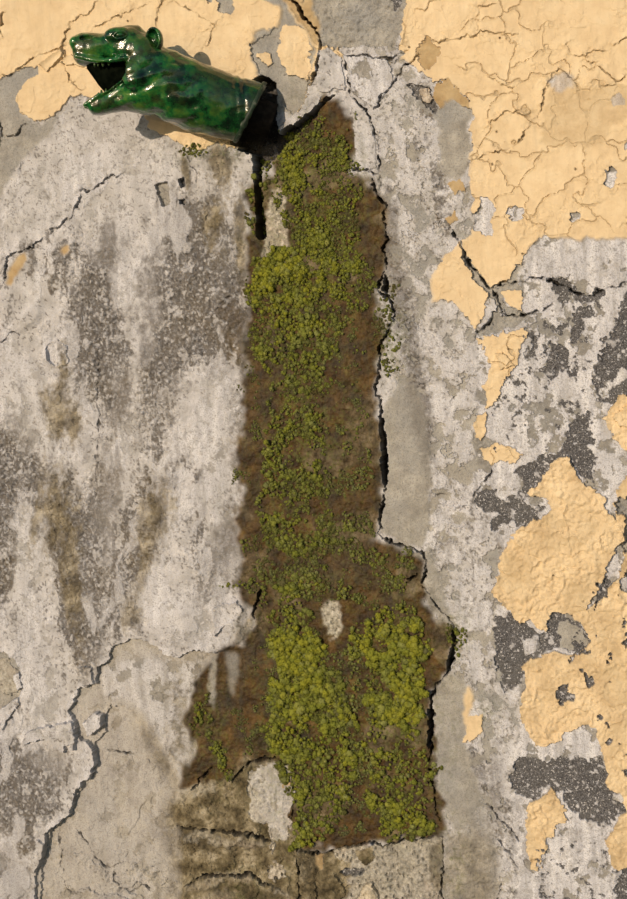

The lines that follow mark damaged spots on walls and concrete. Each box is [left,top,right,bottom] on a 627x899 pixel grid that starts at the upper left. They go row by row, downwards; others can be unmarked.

peeling [0,49,87,197]
crack [0,172,123,289]
crack [0,0,216,92]
peeling [236,0,407,239]
crack [289,0,517,418]
peeling [408,78,473,196]
crack [450,225,627,341]
spalling [0,652,23,730]
damp [0,94,457,854]
spalling [22,639,449,899]
crack [178,440,458,899]
peeling [461,236,627,899]